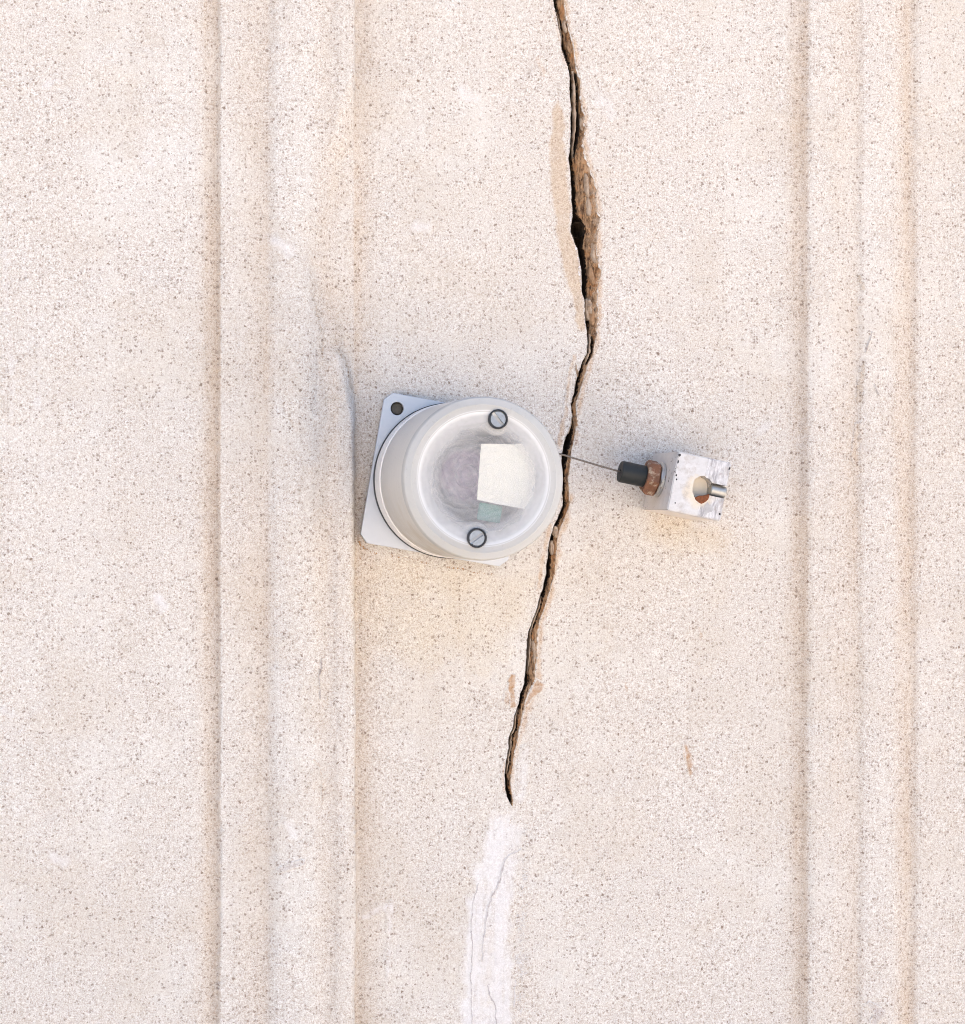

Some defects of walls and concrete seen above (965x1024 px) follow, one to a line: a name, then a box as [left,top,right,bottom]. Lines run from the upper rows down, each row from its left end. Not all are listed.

crack [504,0,593,824]
crack [470,848,522,1024]